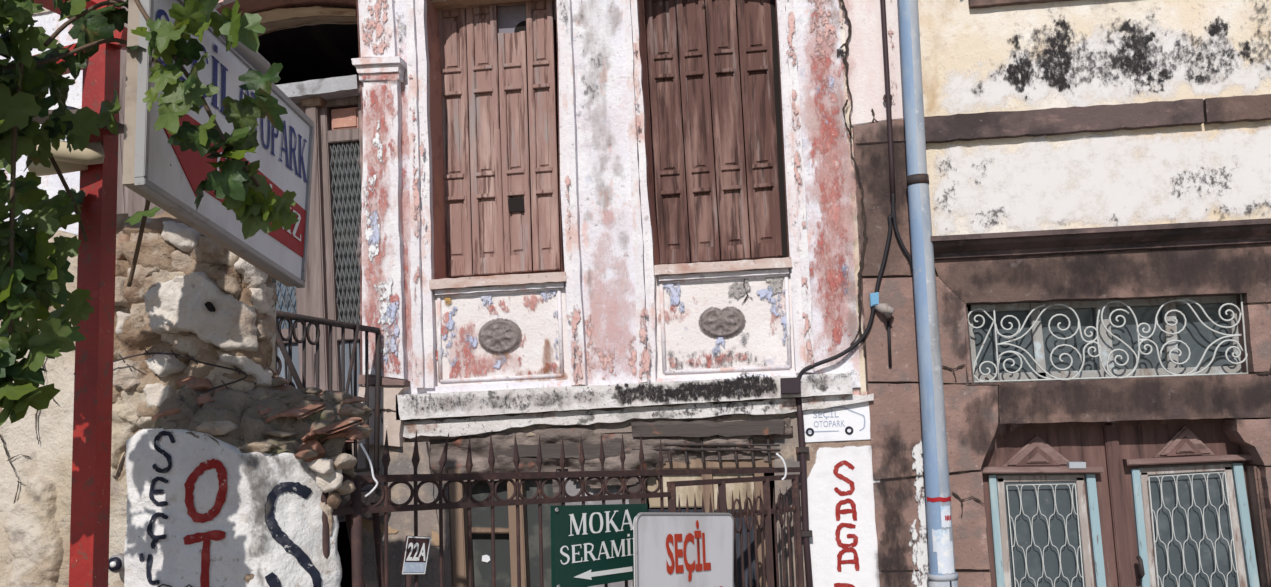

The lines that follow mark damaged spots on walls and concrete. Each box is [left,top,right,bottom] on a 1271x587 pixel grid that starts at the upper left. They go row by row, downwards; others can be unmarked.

peeling [362,0,392,55]
leakage [971,0,1271,99]
peeling [361,70,425,374]
peeling [728,0,859,366]
crack [837,0,878,355]
crack [0,365,58,503]
leakage [406,390,594,411]
peeling [436,241,695,381]
leakage [614,332,777,419]
peeling [669,337,747,369]